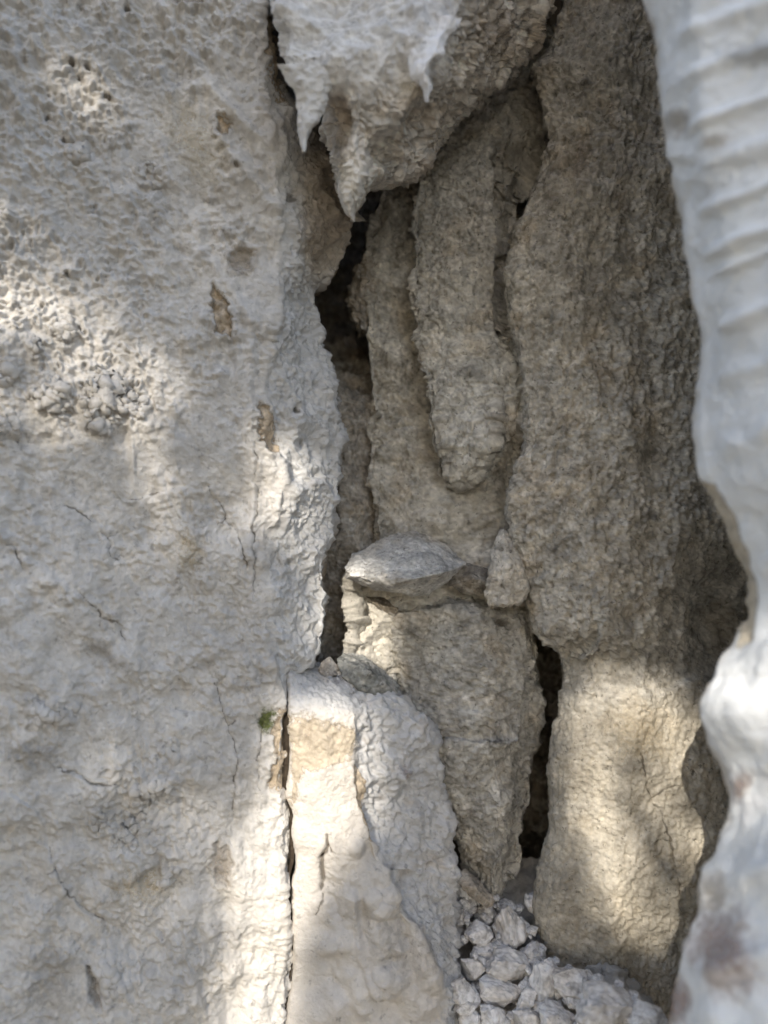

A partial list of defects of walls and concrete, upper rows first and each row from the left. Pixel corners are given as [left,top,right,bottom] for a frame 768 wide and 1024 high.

spalling [210,285,233,337]
spalling [257,401,279,452]
crack [282,702,294,920]
crack [285,946,293,1010]